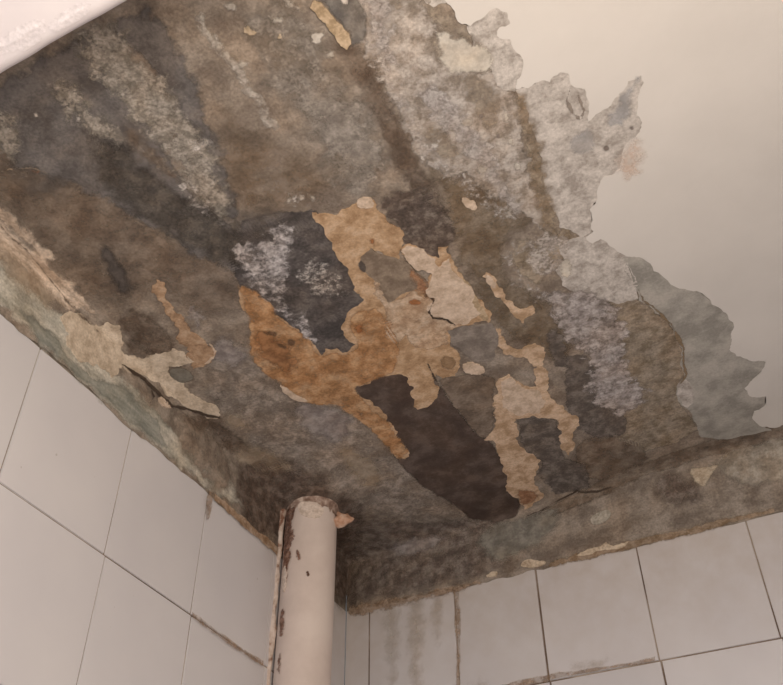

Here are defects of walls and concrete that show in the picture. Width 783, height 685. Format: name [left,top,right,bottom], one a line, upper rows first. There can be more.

damp [54,79,123,141]
damp [114,5,325,218]
damp [247,0,384,195]
crack [1,227,91,325]
damp [243,212,293,294]
peeling [0,0,771,524]
damp [504,228,577,285]
damp [119,310,173,354]
crack [122,364,220,418]
corrosion [206,491,324,592]
peeling [307,450,783,614]
damp [655,465,718,504]